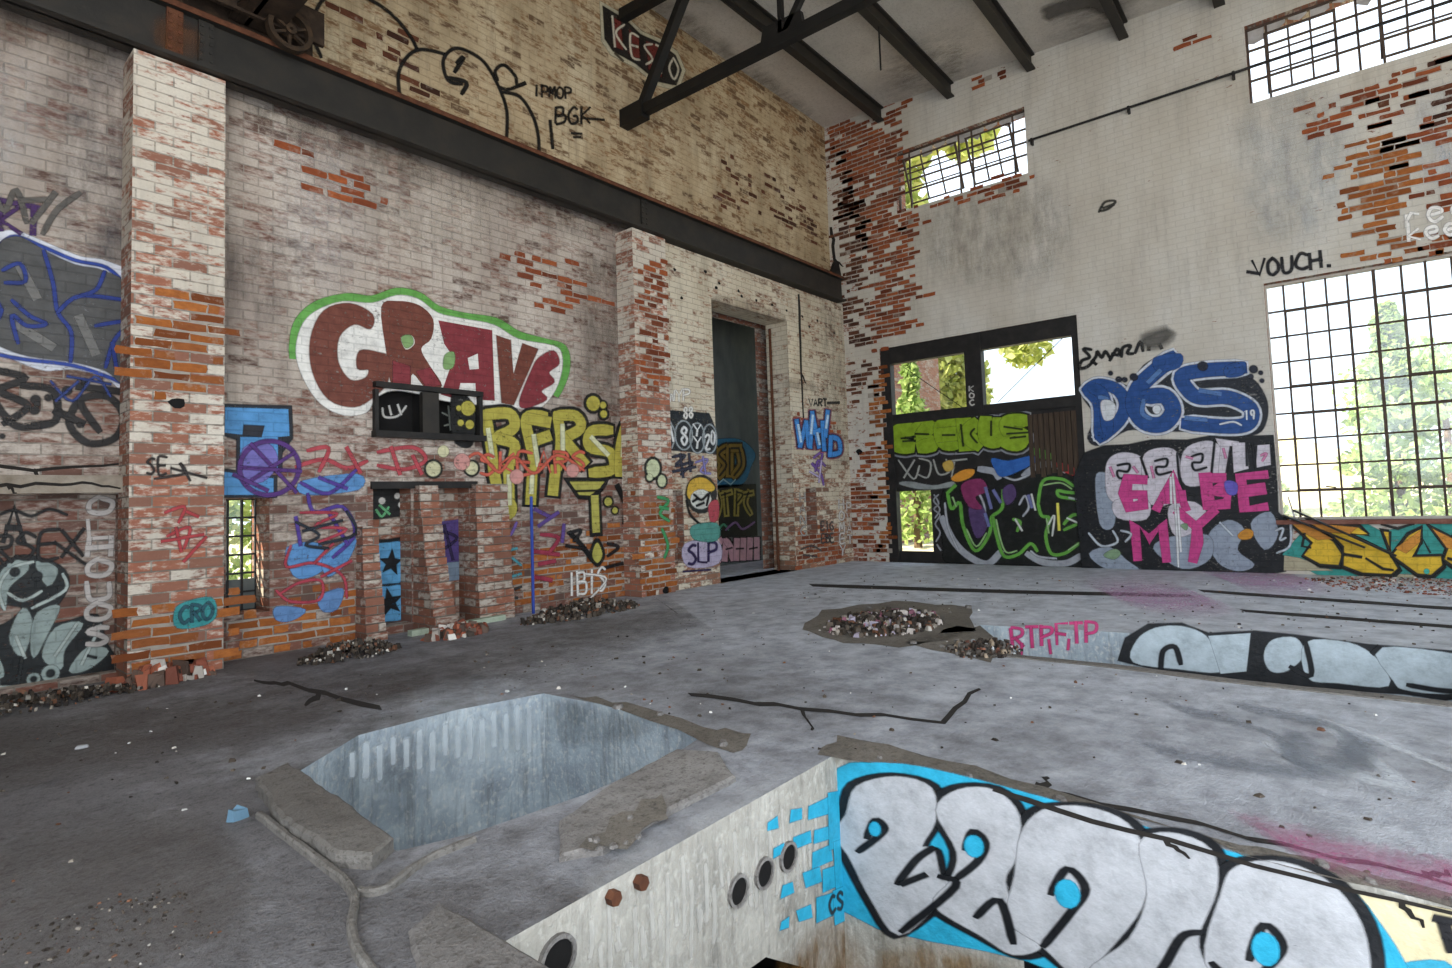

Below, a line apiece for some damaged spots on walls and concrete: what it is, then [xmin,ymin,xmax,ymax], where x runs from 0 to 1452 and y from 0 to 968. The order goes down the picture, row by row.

peeling [273,139,388,209]
peeling [1293,55,1452,264]
peeling [499,251,615,314]
peeling [633,259,683,392]
peeling [713,98,1035,570]